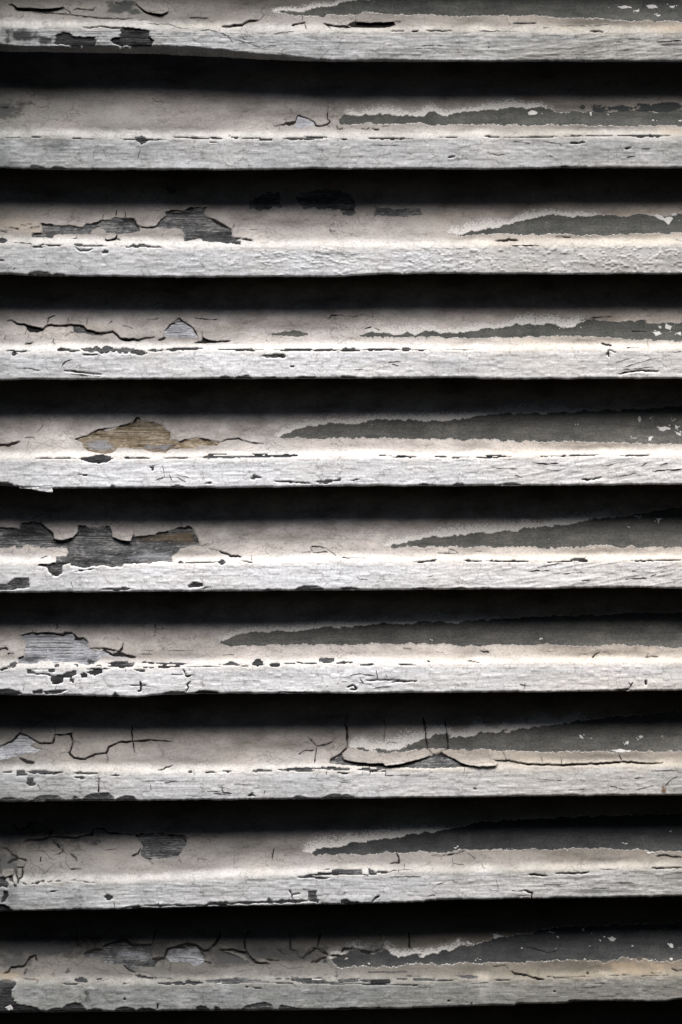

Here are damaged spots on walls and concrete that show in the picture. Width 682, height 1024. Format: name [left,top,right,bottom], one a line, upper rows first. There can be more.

crack [4,315,158,344]
crack [193,315,230,343]
peeling [218,312,682,379]
peeling [37,417,298,488]
peeling [274,401,682,457]
peeling [0,515,226,587]
peeling [381,505,682,563]
peeling [203,610,682,667]
crack [28,726,265,797]
crack [12,820,135,877]
peeling [104,813,682,908]
crack [4,930,133,983]